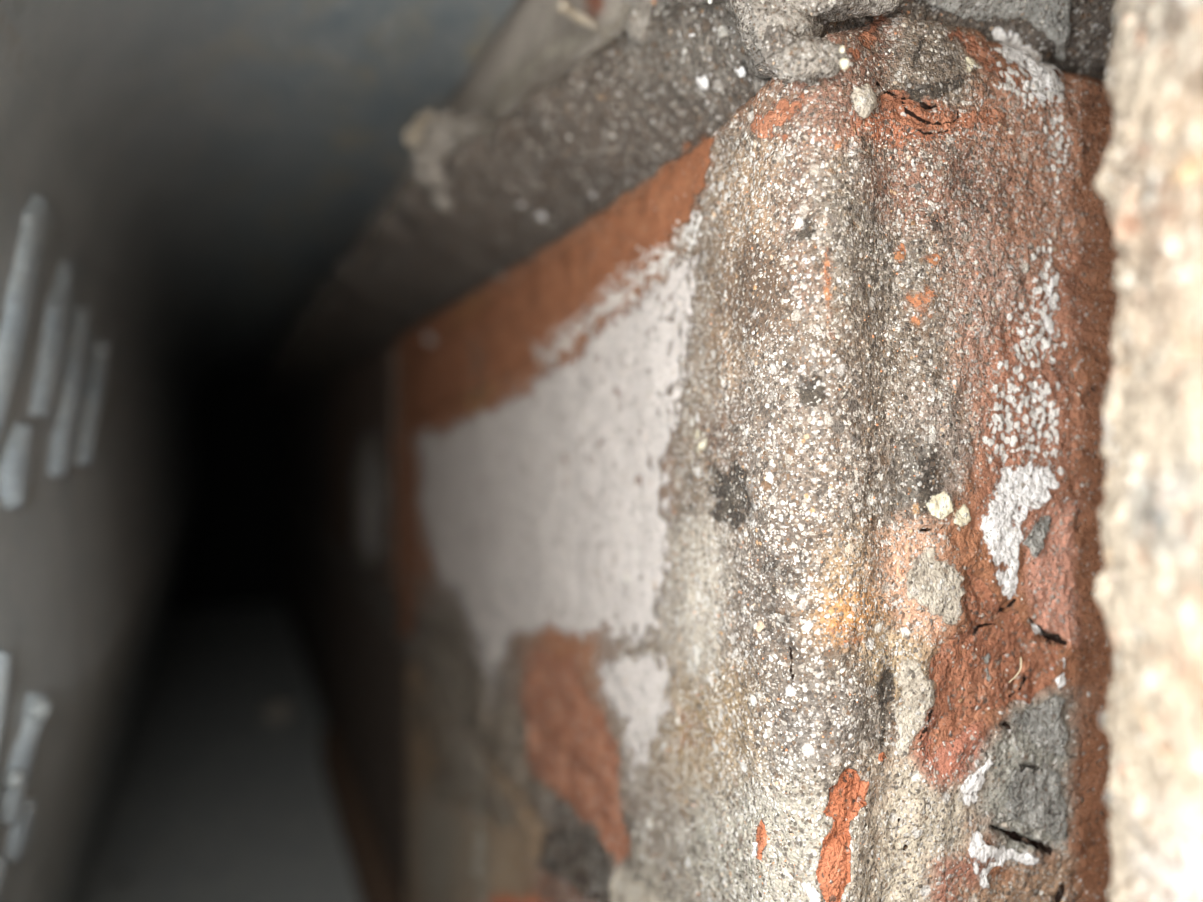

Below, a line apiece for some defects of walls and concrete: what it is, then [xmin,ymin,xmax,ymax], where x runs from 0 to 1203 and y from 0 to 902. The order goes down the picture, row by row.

peeling [750,0,887,141]
flaking render [947,27,1019,93]
crack [876,82,959,135]
spalling [880,89,1015,132]
flaking render [410,135,714,423]
crack [959,599,1068,646]
spalling [927,568,1060,757]
spalling [521,648,630,865]
spalling [816,768,869,902]
crack [989,825,1053,856]
crack [1054,884,1065,902]